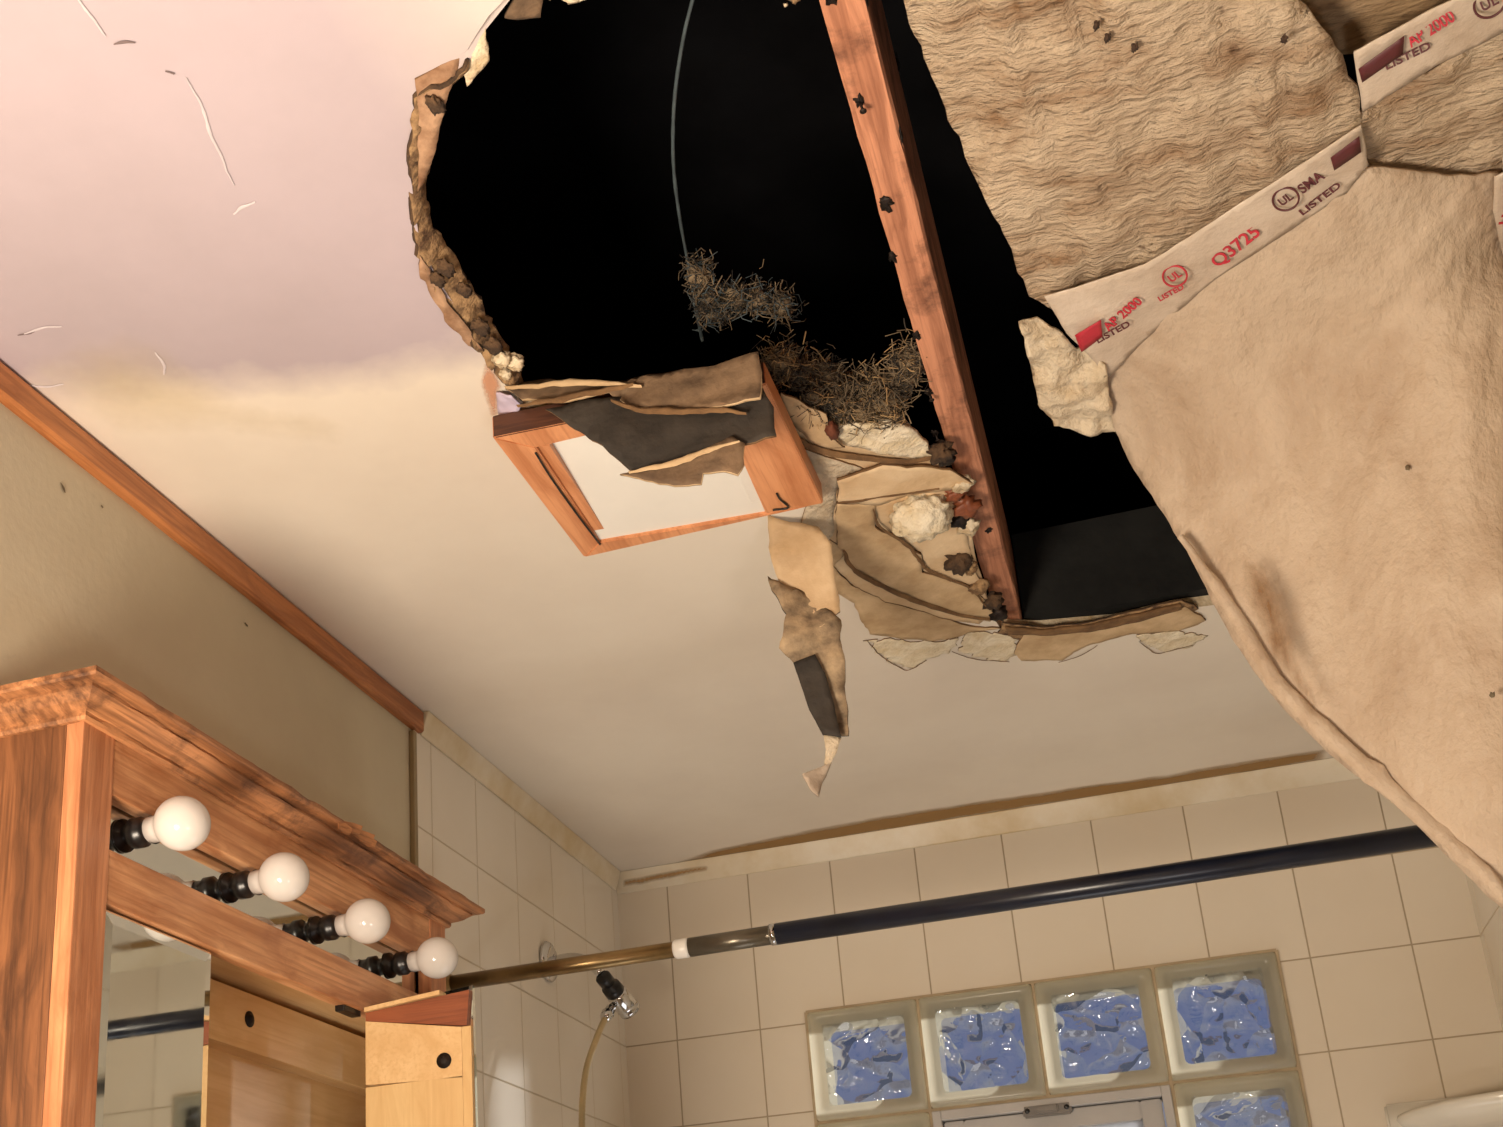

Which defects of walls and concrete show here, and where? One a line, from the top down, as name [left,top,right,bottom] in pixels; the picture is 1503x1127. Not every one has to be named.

crack [78,0,135,45]
flaking render [504,0,543,20]
crack [165,71,255,215]
flaking render [406,28,524,415]
spalling [863,599,1208,671]